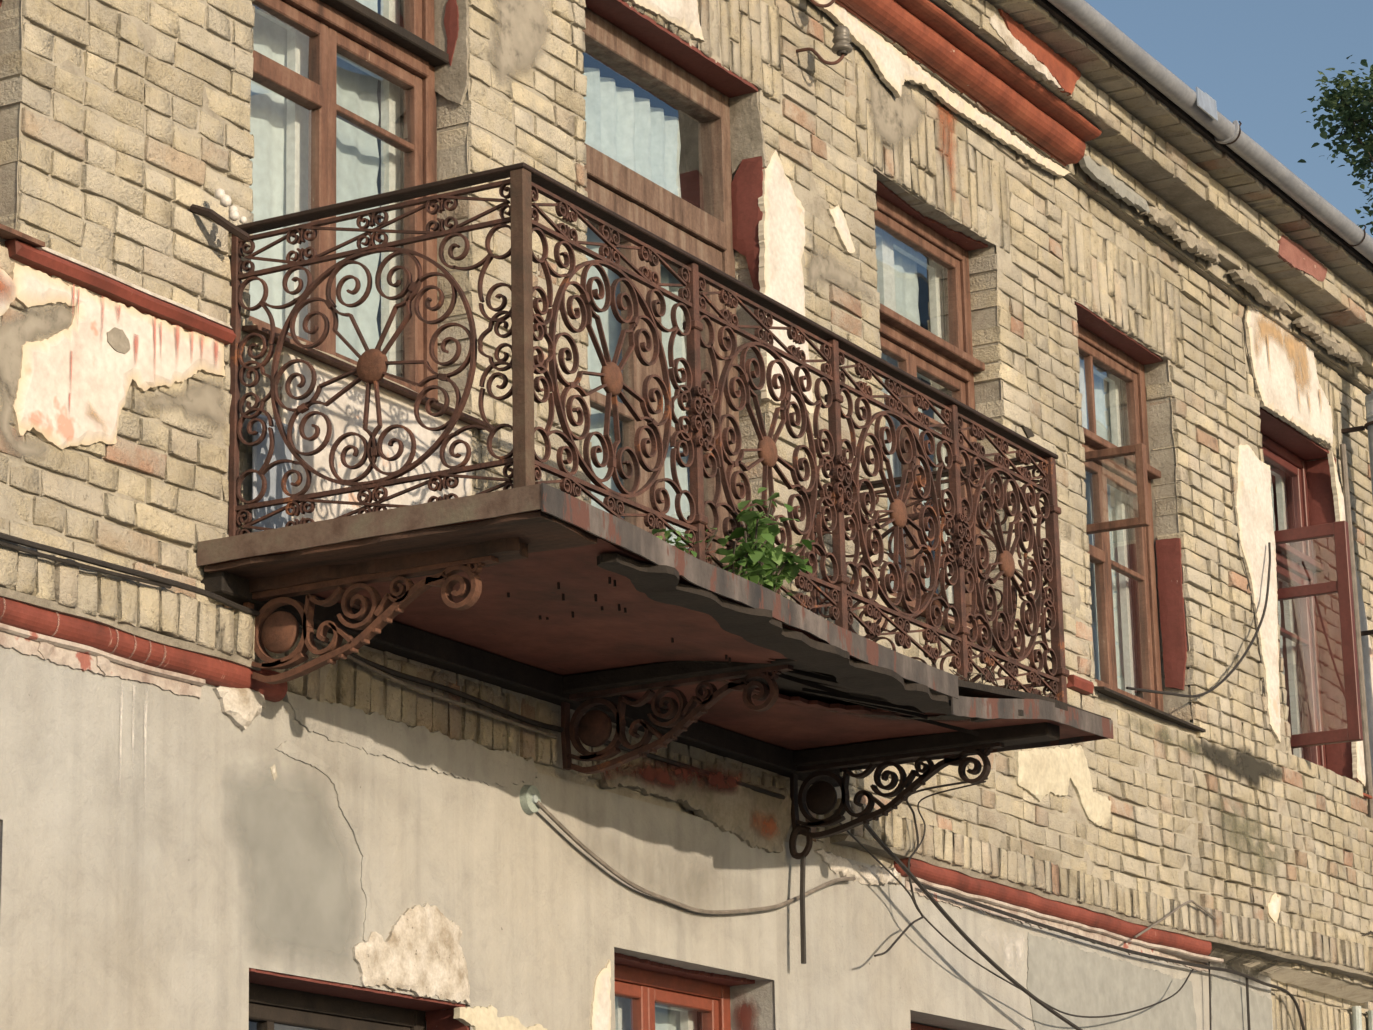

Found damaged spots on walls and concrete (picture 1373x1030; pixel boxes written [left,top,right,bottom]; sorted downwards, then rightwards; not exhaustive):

peeling [629,0,705,42]
peeling [809,0,1070,177]
peeling [731,150,806,316]
peeling [0,262,225,450]
peeling [760,316,814,414]
peeling [1140,205,1363,522]
peeling [1231,444,1281,744]
peeling [1351,561,1373,817]
spalling [352,903,547,1030]